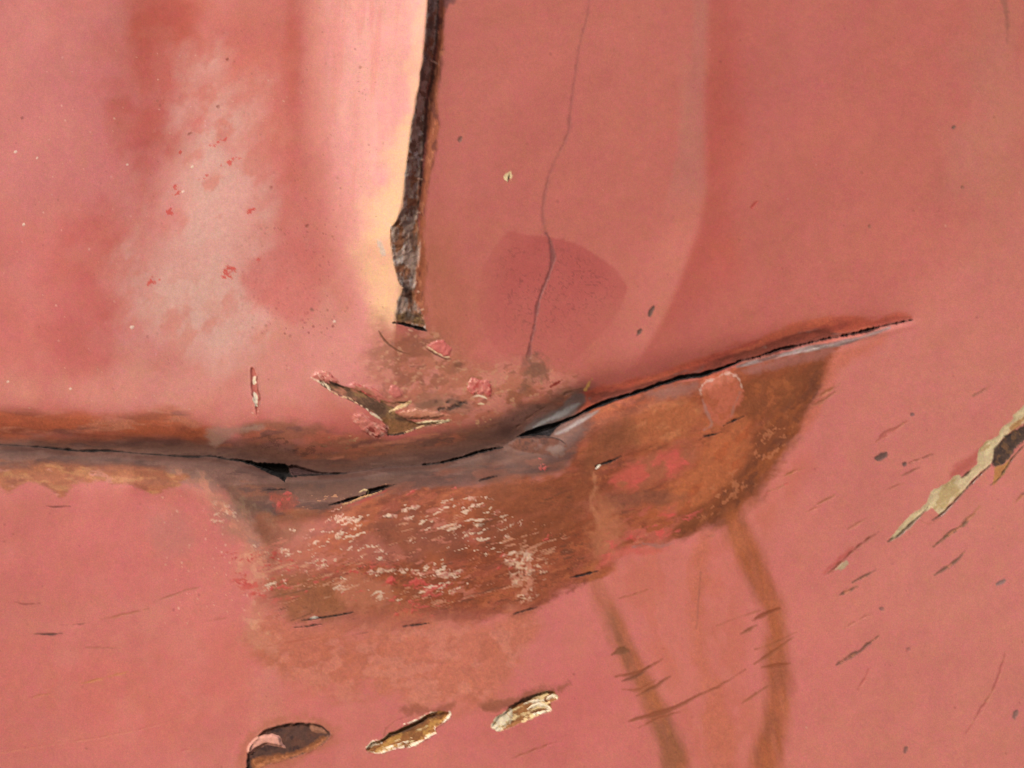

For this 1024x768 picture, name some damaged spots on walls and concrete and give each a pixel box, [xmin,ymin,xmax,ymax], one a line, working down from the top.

rust [413,0,449,318]
crack [515,0,592,398]
rust [0,401,213,446]
peeling [249,366,262,417]
peeling [309,369,454,440]
crack [0,318,914,483]
rust [0,460,191,500]
peeling [822,404,1024,577]
rust [209,309,914,768]
peeling [245,721,333,768]
peeling [364,712,452,755]
peeling [490,690,560,733]